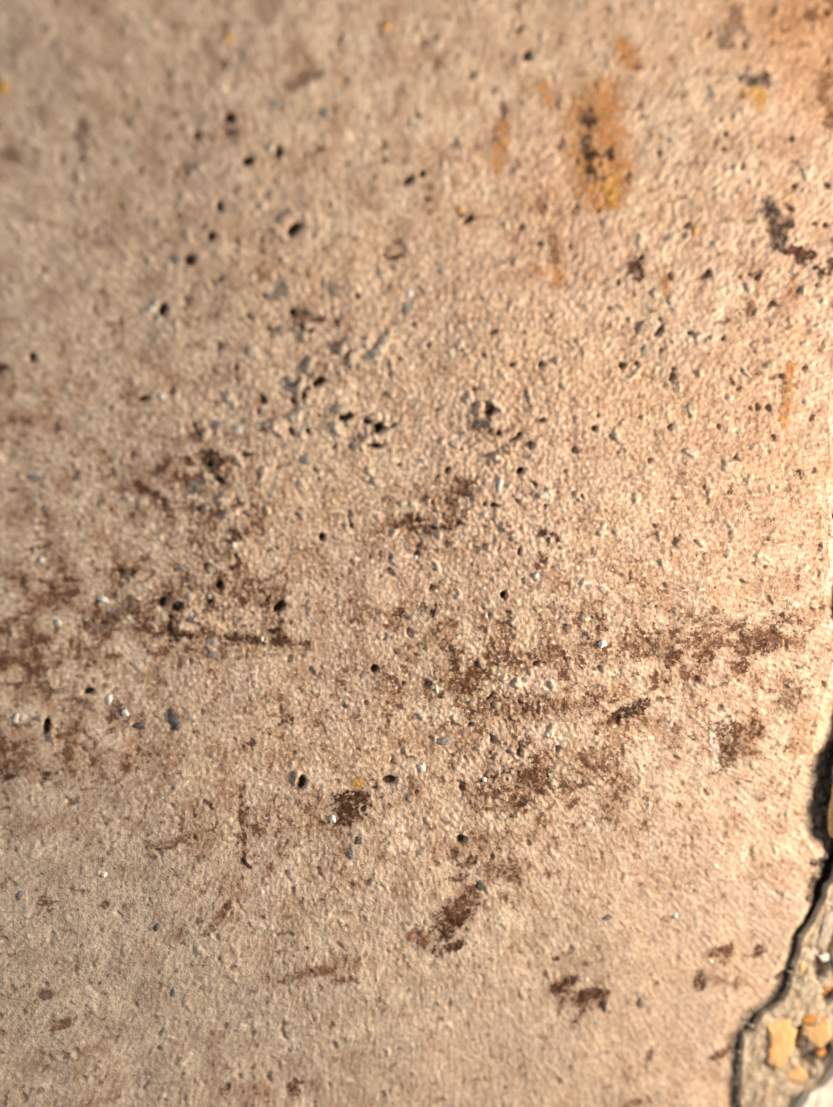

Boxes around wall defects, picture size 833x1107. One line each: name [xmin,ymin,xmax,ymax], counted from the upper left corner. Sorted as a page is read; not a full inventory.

rust [537,37,645,214]